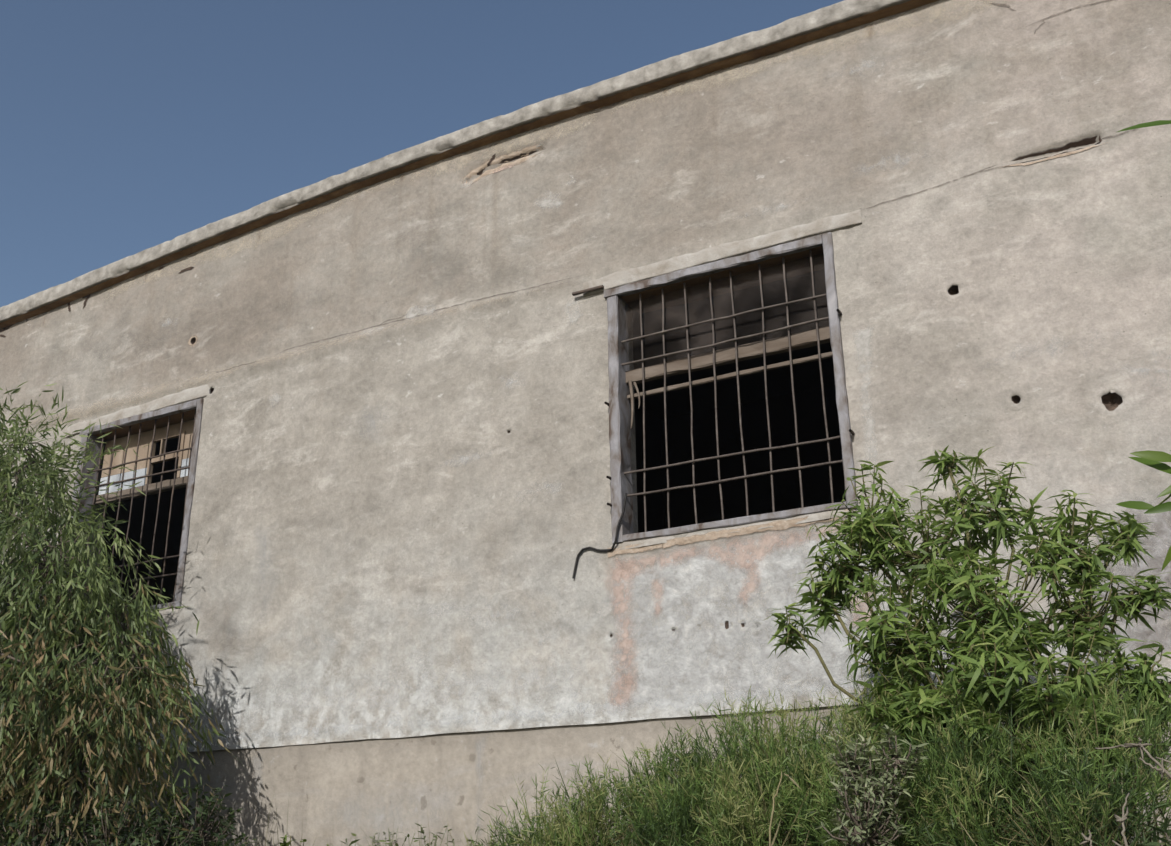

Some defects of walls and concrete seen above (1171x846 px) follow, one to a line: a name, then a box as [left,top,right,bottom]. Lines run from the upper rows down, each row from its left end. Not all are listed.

crack [1039,0,1110,27]
spalling [463,144,544,186]
spalling [1000,135,1108,168]
spalling [1092,384,1130,417]